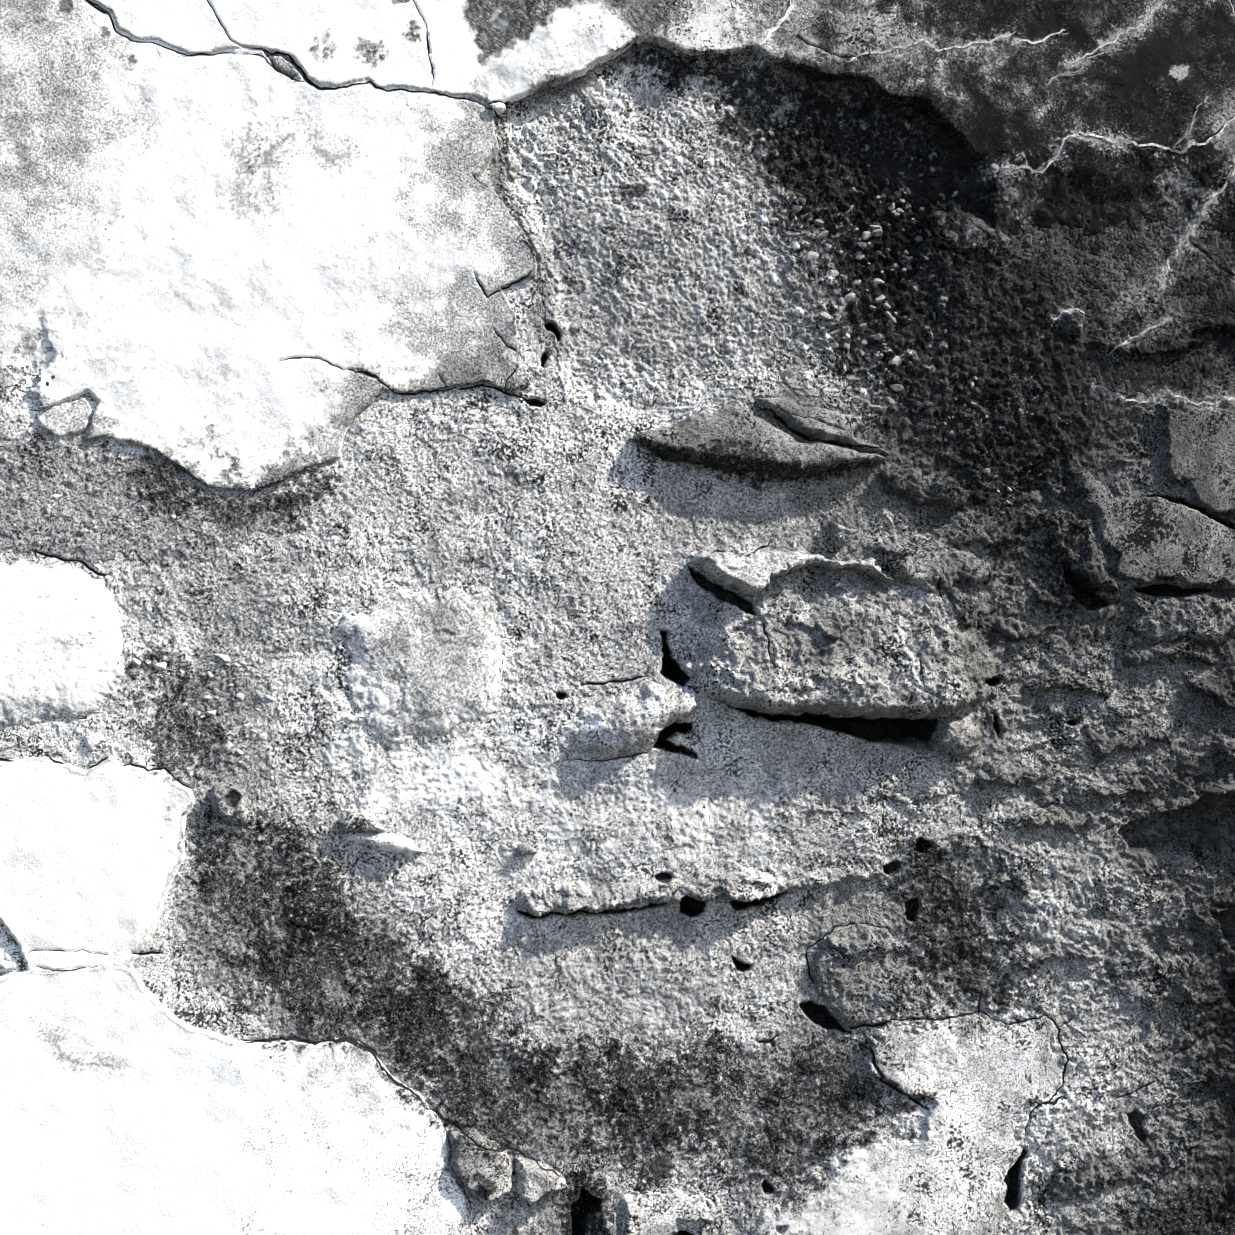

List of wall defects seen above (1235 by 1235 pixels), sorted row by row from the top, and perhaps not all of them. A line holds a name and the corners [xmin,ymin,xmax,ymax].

crack [86,0,511,119]
damp [353,35,388,68]
crack [798,29,874,58]
damp [0,54,485,536]
spalling [0,0,1001,568]
damp [464,0,1235,667]
spalling [0,701,476,1235]
damp [114,633,1057,1235]
crack [805,923,894,985]
spalling [863,1011,1059,1150]
crack [849,996,1074,1140]
spalling [621,1190,723,1235]